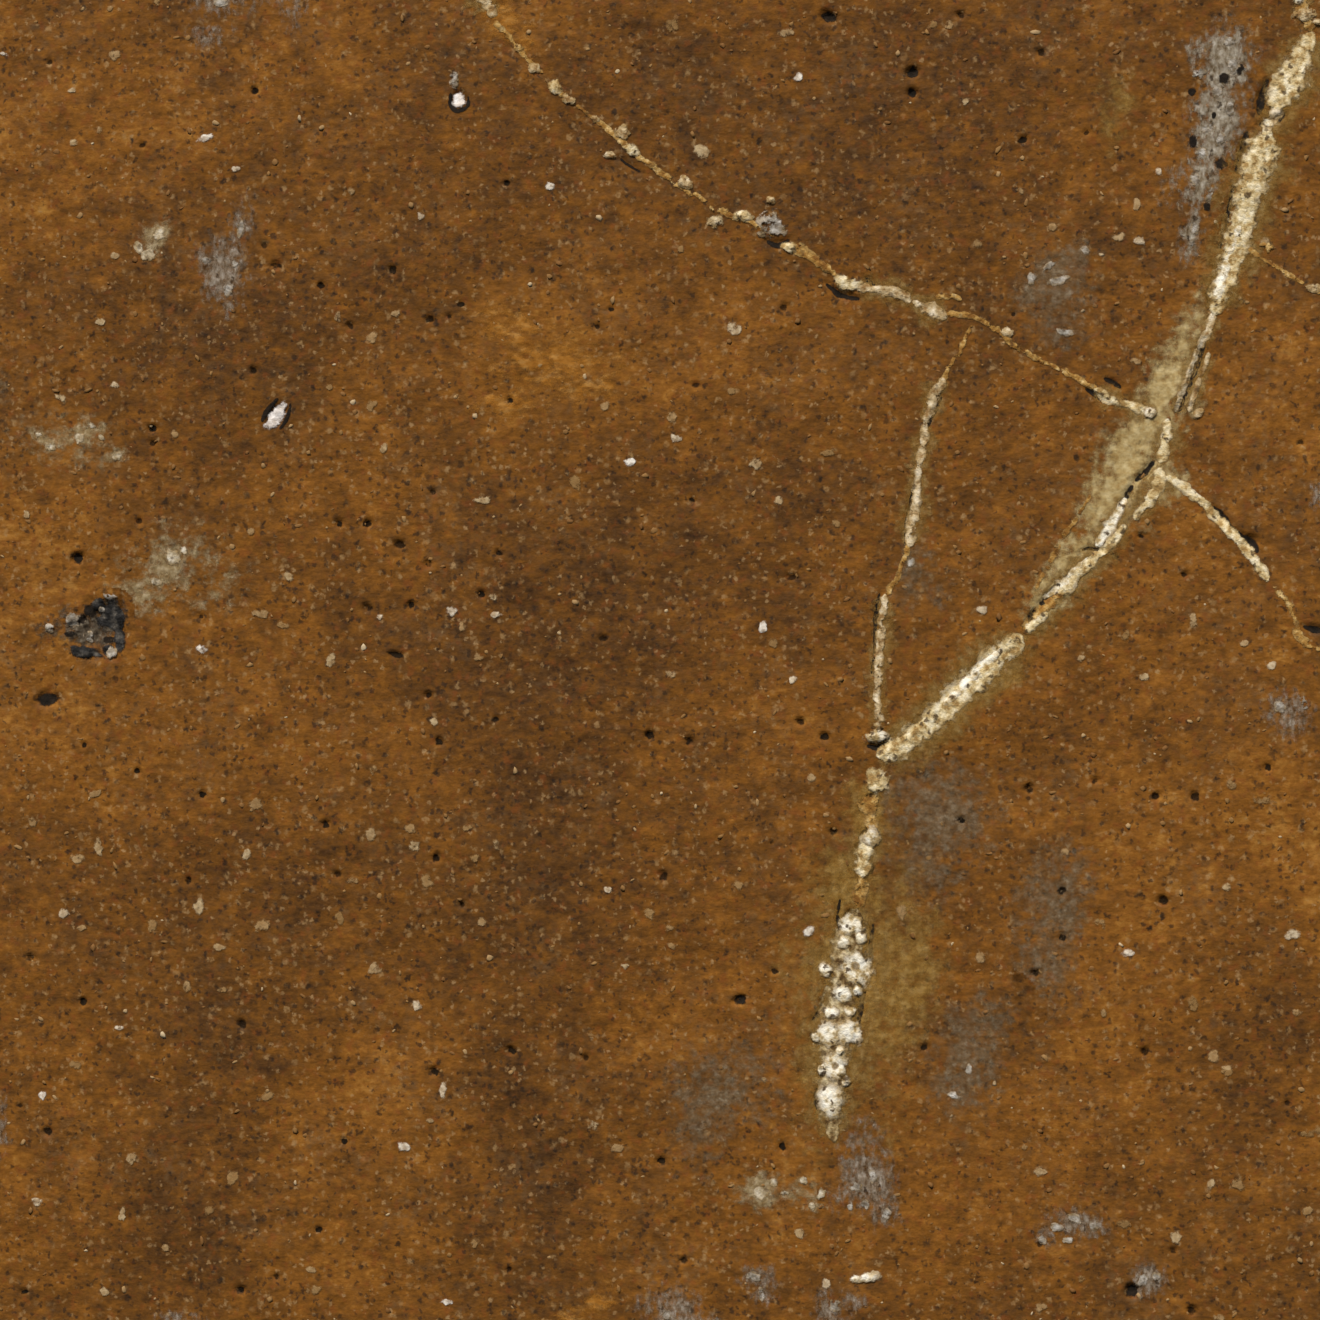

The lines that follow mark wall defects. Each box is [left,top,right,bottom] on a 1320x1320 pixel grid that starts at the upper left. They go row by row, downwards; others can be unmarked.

crack [466,0,1320,1142]
damp [1024,291,1205,627]
damp [892,635,1026,753]
damp [851,782,885,851]
damp [800,851,936,1087]